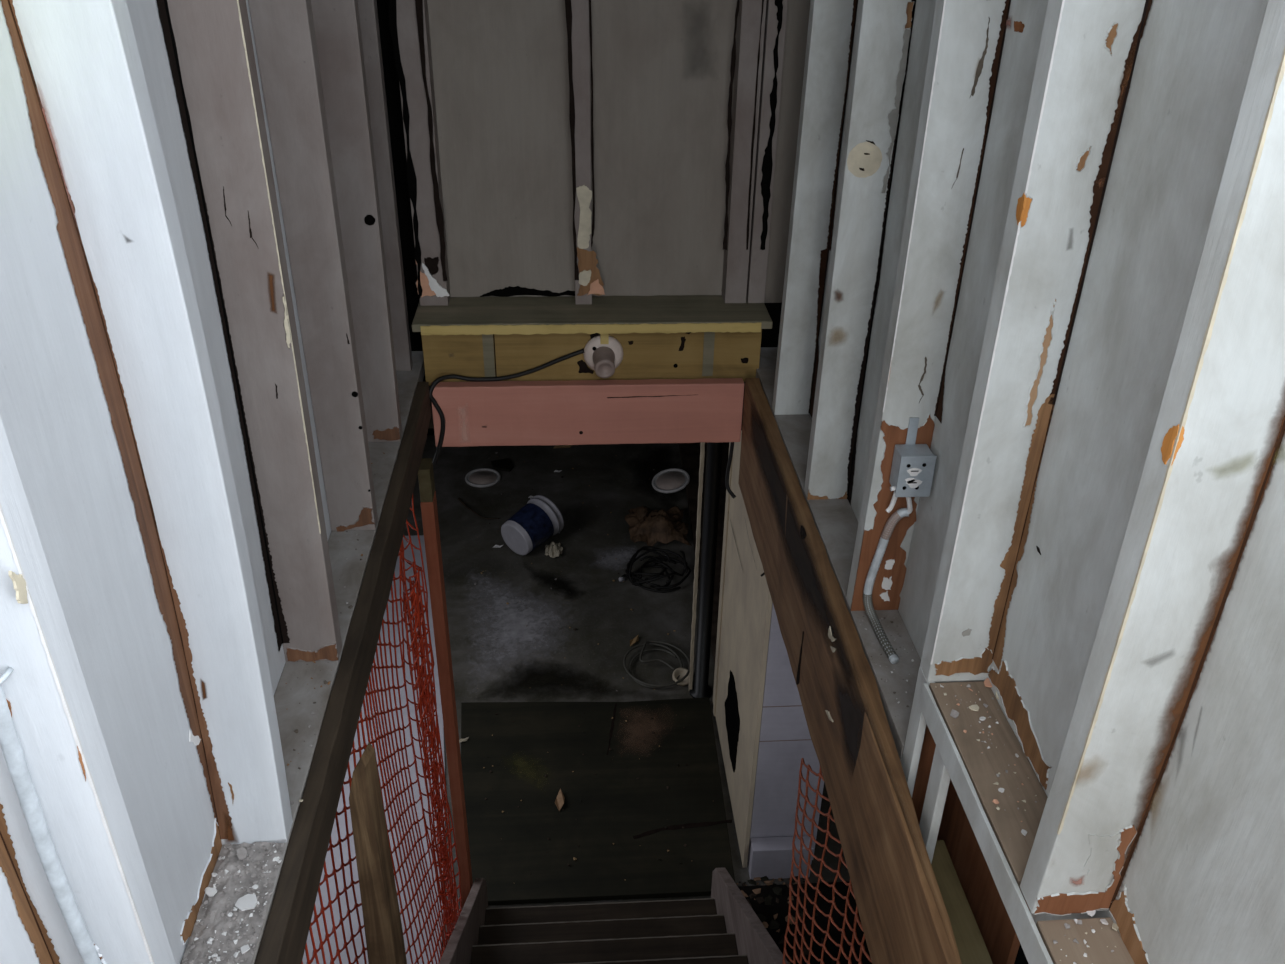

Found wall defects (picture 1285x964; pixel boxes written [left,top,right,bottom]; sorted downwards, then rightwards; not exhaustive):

peeling [576,247,604,296]
peeling [1016,193,1033,228]
peeling [1023,299,1057,427]
crack [987,0,1152,670]
peeling [1161,424,1185,465]
peeling [850,413,935,613]
peeling [8,571,28,604]
peeling [934,647,1052,790]
peeling [1033,824,1151,964]